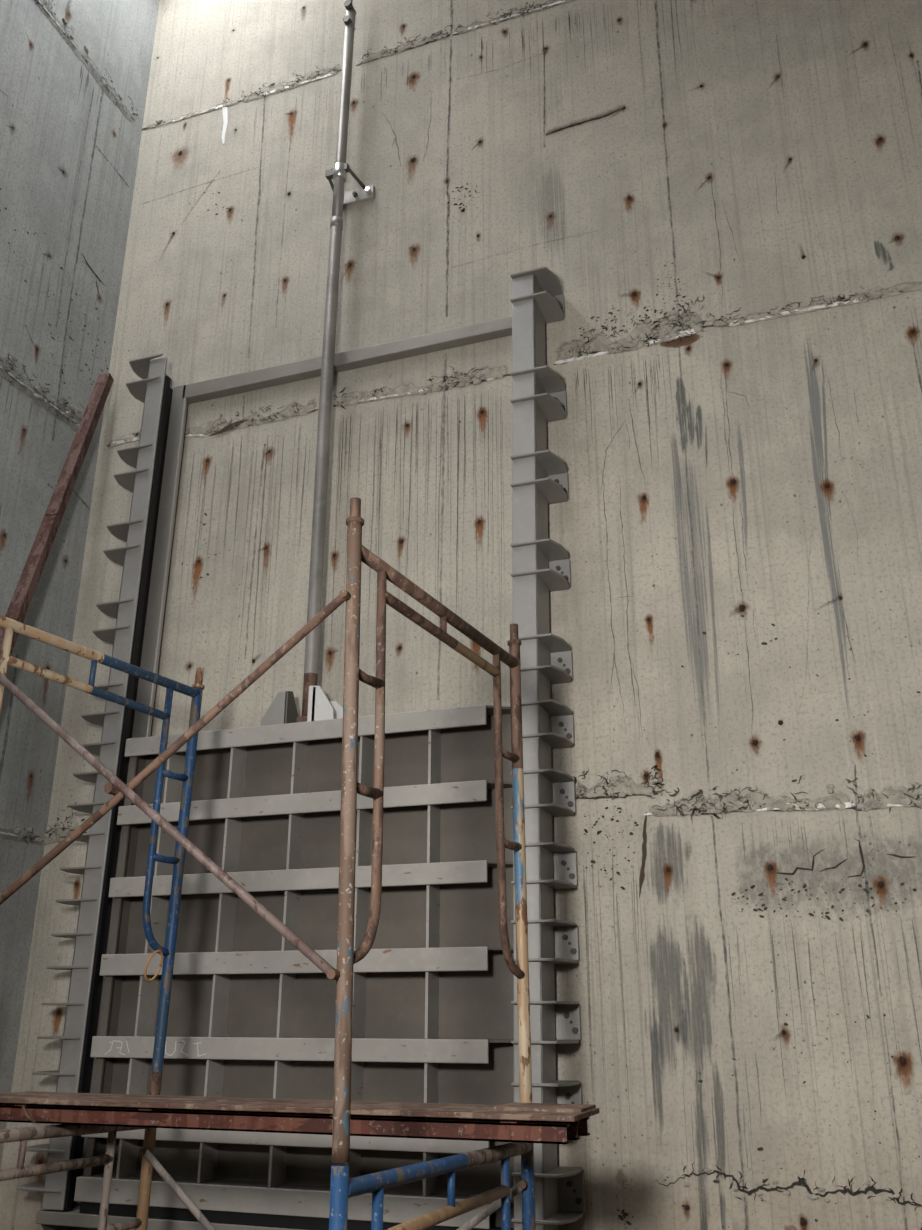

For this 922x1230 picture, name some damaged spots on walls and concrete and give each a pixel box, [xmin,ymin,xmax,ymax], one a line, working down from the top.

leakage [608,360,716,675]
leakage [806,348,845,677]
crack [776,806,916,877]
leakage [651,926,711,1118]
rust [894,1053,911,1084]
leakage [697,1074,725,1230]
crack [656,1162,922,1209]